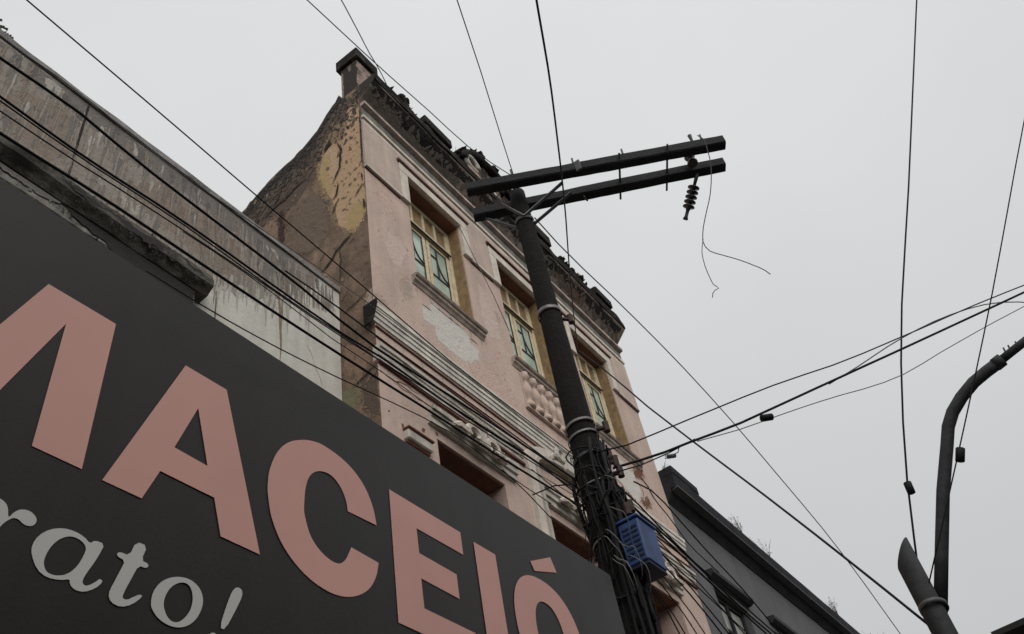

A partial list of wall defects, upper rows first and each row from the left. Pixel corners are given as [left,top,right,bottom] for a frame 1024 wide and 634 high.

leakage [0,40,496,334]
peeling [315,103,367,279]
crack [332,106,363,214]
peeling [420,300,481,365]
leakage [541,248,621,343]